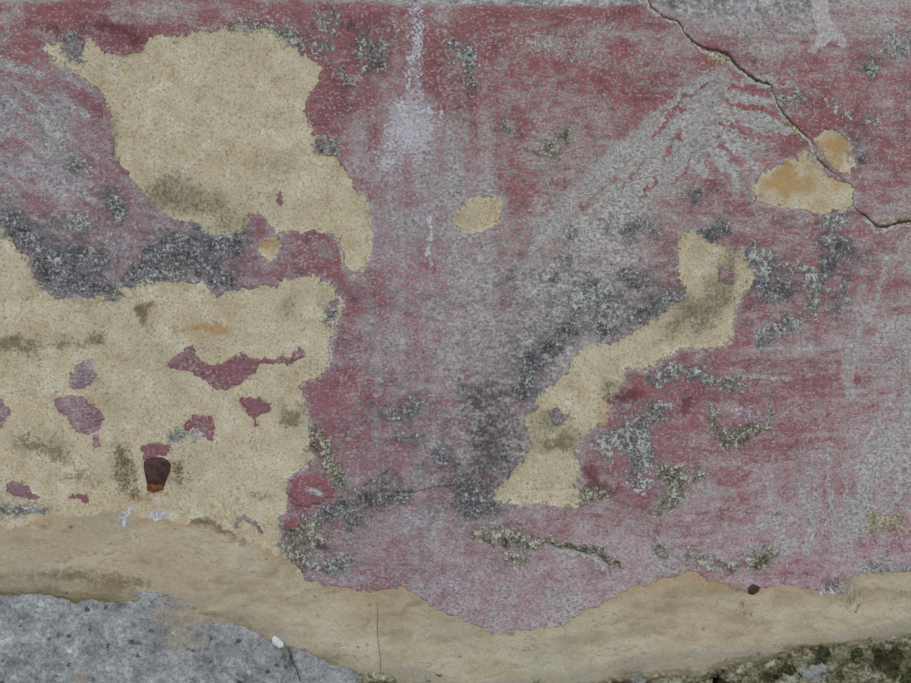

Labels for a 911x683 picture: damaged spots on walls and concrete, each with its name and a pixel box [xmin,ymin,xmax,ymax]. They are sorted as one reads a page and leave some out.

spalling [43,24,375,280]
spalling [451,193,504,234]
crack [645,0,911,234]
spalling [751,129,856,215]
spalling [0,225,346,585]
spalling [488,229,755,509]